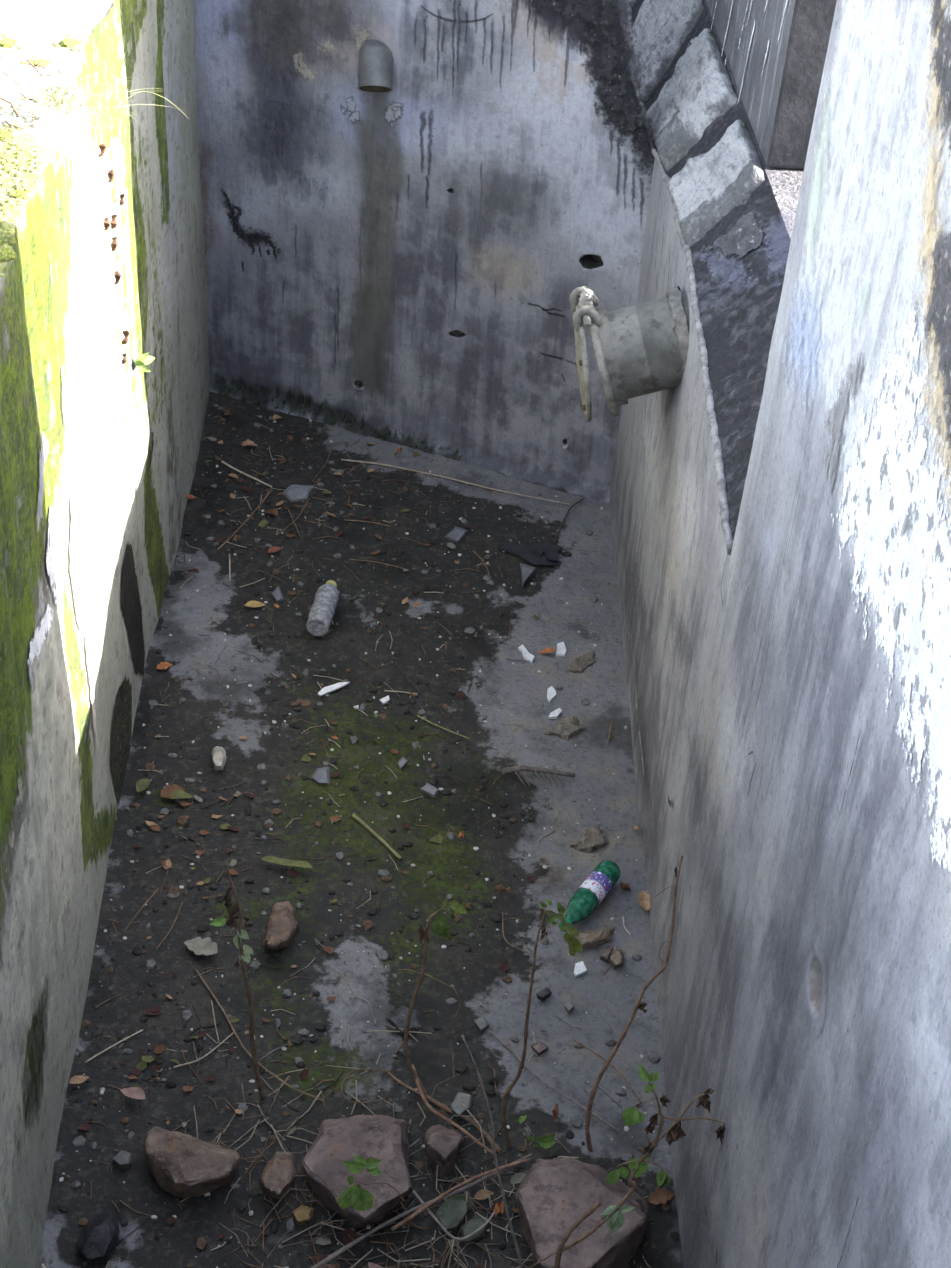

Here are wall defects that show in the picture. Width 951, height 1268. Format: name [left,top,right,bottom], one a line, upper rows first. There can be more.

damp [414,0,595,87]
damp [711,0,768,101]
damp [420,112,432,201]
damp [354,93,402,390]